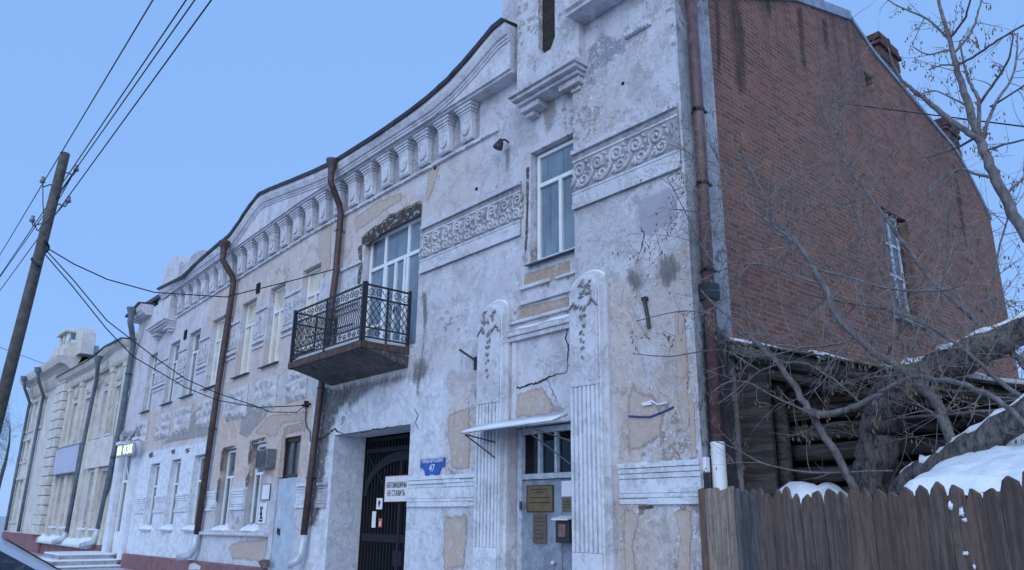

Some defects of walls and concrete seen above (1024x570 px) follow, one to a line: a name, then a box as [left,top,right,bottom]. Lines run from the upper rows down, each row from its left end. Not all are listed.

crack [517,329,569,398]
peeling [446,386,477,469]
peeling [517,387,566,418]
peeling [627,385,669,451]
peeling [229,527,270,567]
peeling [439,508,470,570]